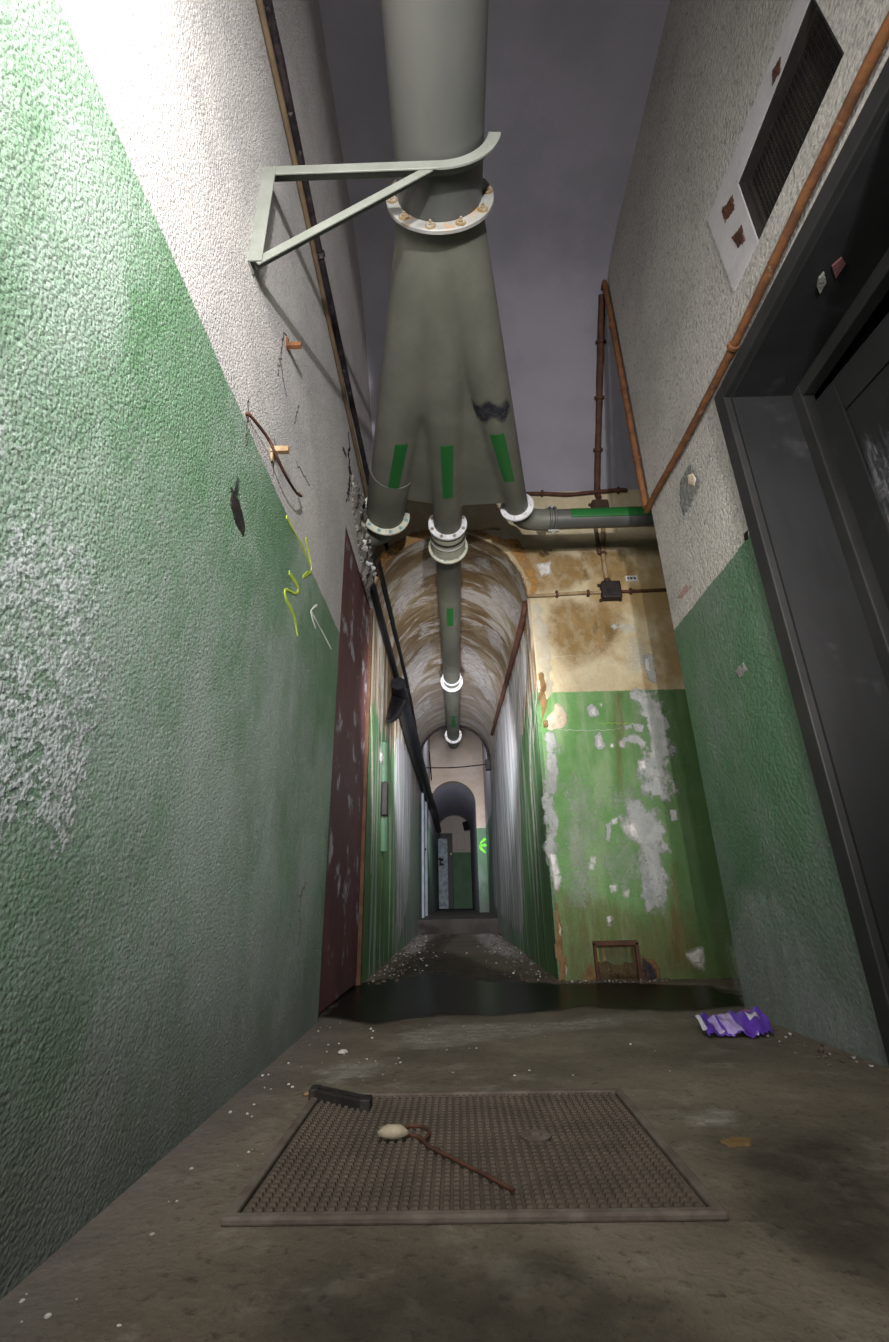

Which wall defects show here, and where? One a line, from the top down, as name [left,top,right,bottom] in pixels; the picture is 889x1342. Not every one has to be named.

damp [467,528,636,661]
damp [461,646,496,701]
peeling [586,654,679,915]